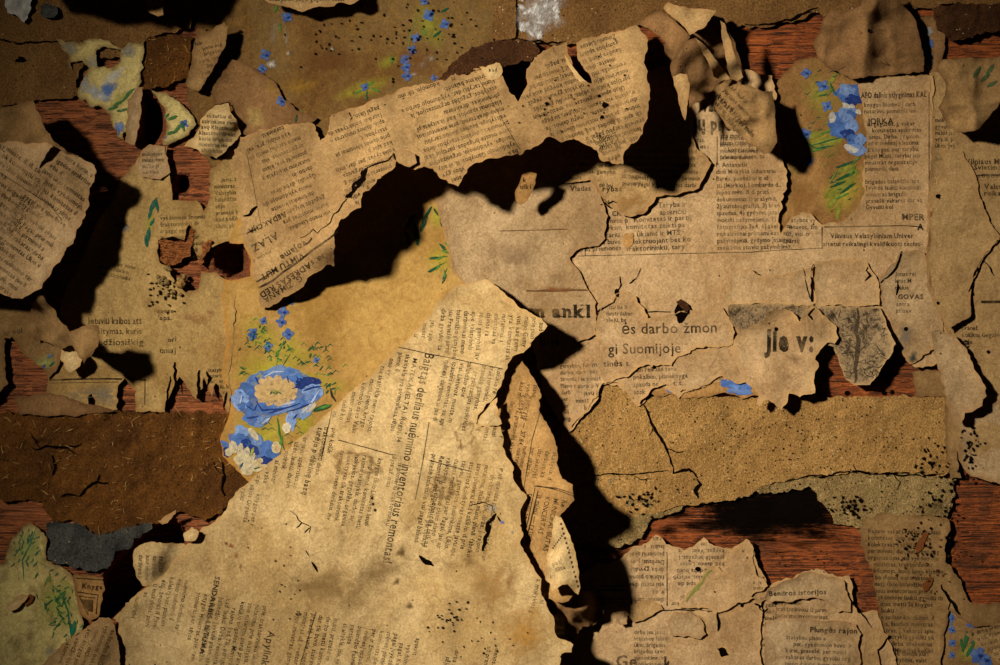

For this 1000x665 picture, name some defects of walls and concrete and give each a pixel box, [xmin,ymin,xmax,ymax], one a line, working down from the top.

peeling [125,87,170,179]
peeling [515,171,537,205]
crack [594,404,702,498]
crack [785,465,944,489]